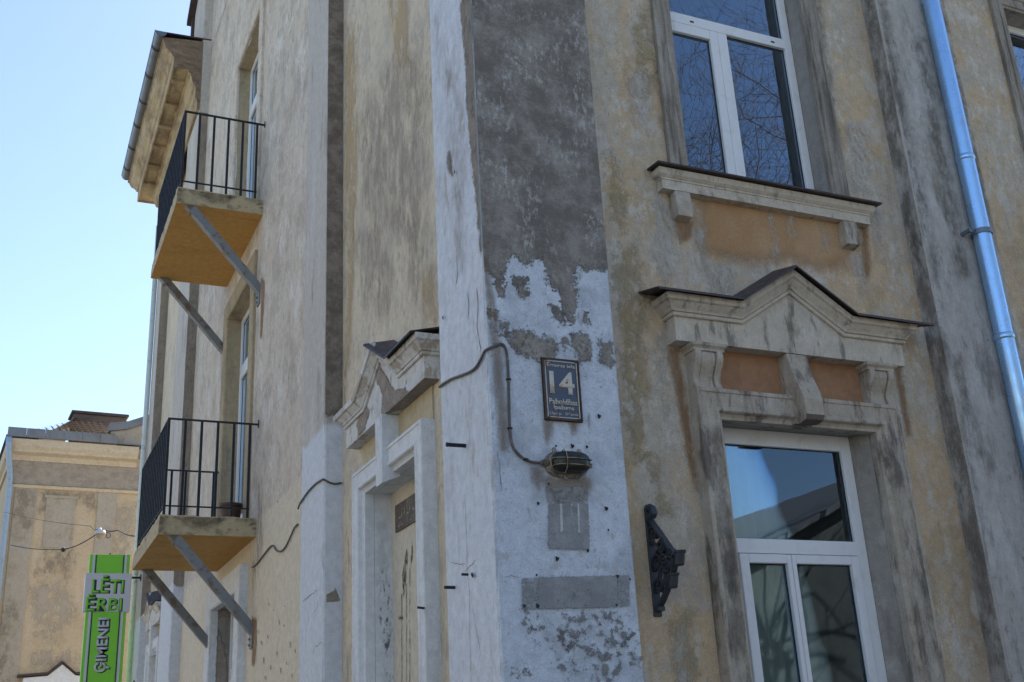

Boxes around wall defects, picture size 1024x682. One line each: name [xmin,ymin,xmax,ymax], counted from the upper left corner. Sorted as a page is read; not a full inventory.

peeling [460,0,671,514]
peeling [521,609,643,682]